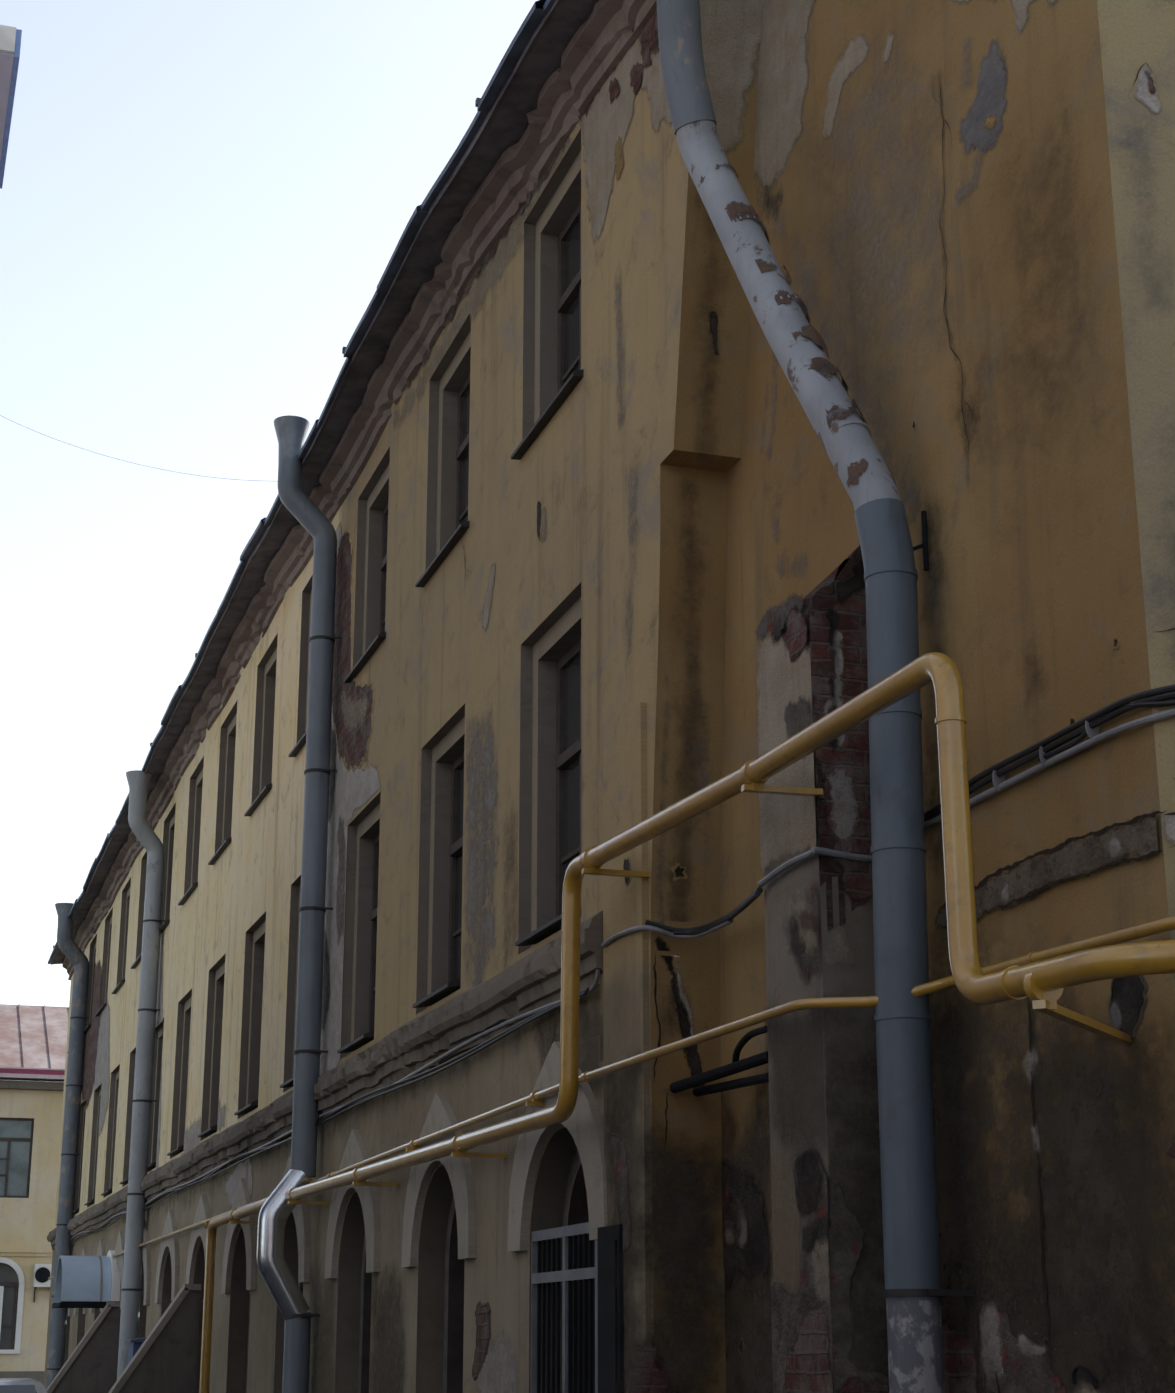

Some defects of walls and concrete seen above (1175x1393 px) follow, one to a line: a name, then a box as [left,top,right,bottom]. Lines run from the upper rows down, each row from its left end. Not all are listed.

flaking render [700,0,815,187]
flaking render [394,9,672,426]
crack [932,74,972,452]
flaking render [756,561,868,757]
flaking render [319,522,380,1075]
flaking render [759,720,873,902]
crack [653,937,705,1154]
spalling [1109,976,1148,1041]
leakage [607,1075,774,1393]
flaking render [721,1147,889,1393]
leakage [825,1057,889,1375]
flaking render [980,1306,1097,1393]